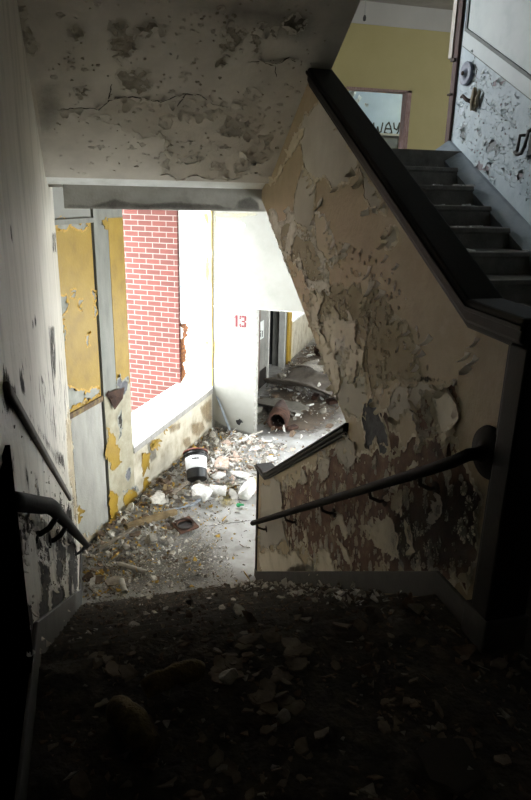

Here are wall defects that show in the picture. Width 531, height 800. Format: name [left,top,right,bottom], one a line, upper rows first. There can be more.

crack [67,84,225,115]
peeling [455,66,531,201]
peeling [48,1,483,595]
peeling [18,385,172,657]